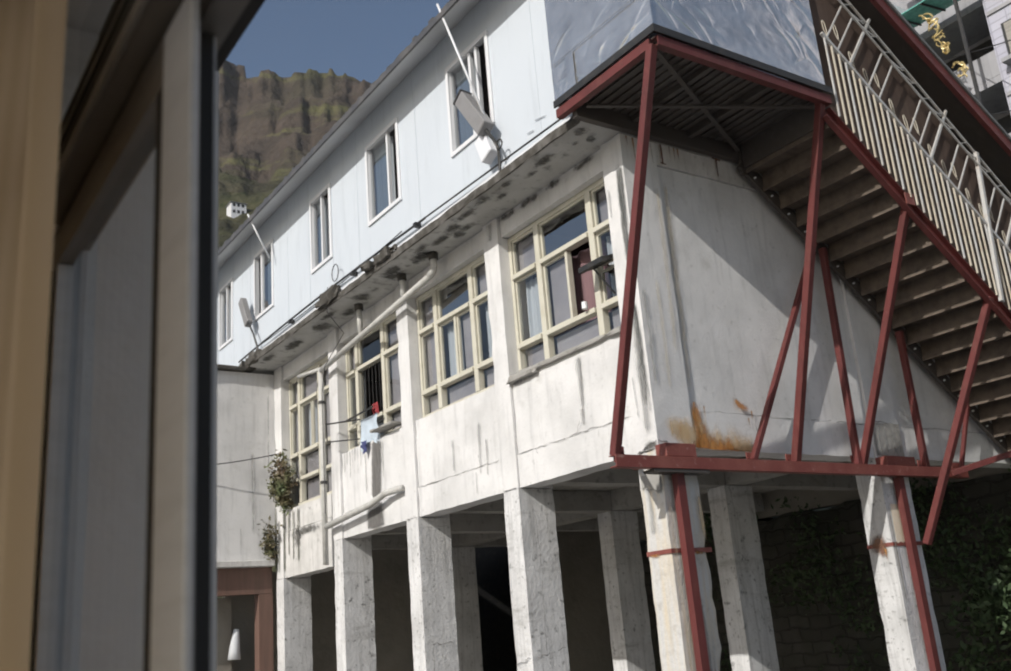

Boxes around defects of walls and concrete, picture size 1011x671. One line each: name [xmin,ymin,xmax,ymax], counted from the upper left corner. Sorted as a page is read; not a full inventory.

damp [412,183,509,264]
damp [501,194,537,220]
damp [608,166,628,260]
damp [314,294,369,330]
rust [671,402,753,452]
rust [872,536,887,557]